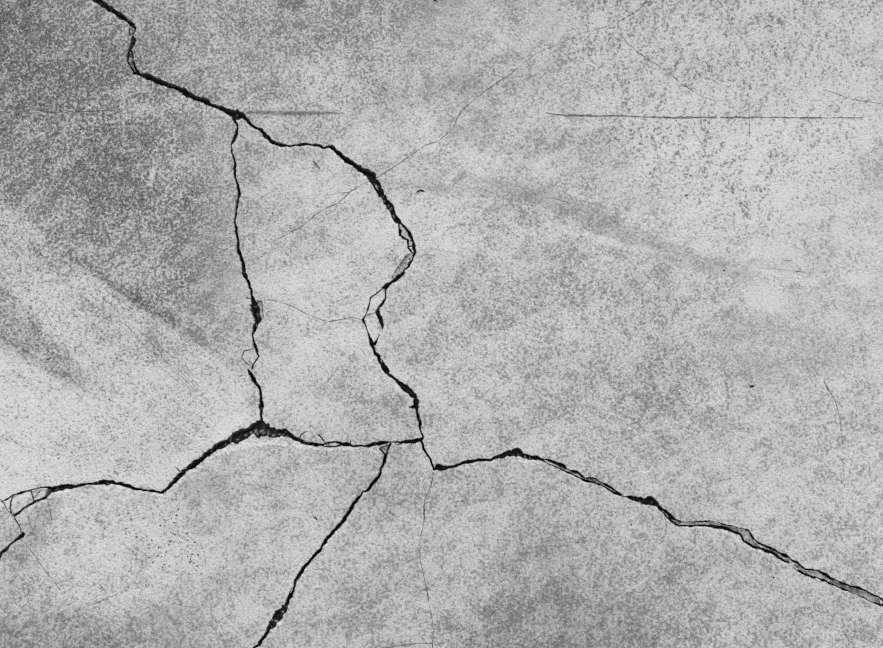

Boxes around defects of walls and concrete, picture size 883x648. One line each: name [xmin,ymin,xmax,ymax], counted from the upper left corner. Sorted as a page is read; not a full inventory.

crack [89,0,424,440]
crack [617,0,719,101]
crack [546,90,882,157]
crack [0,369,883,648]